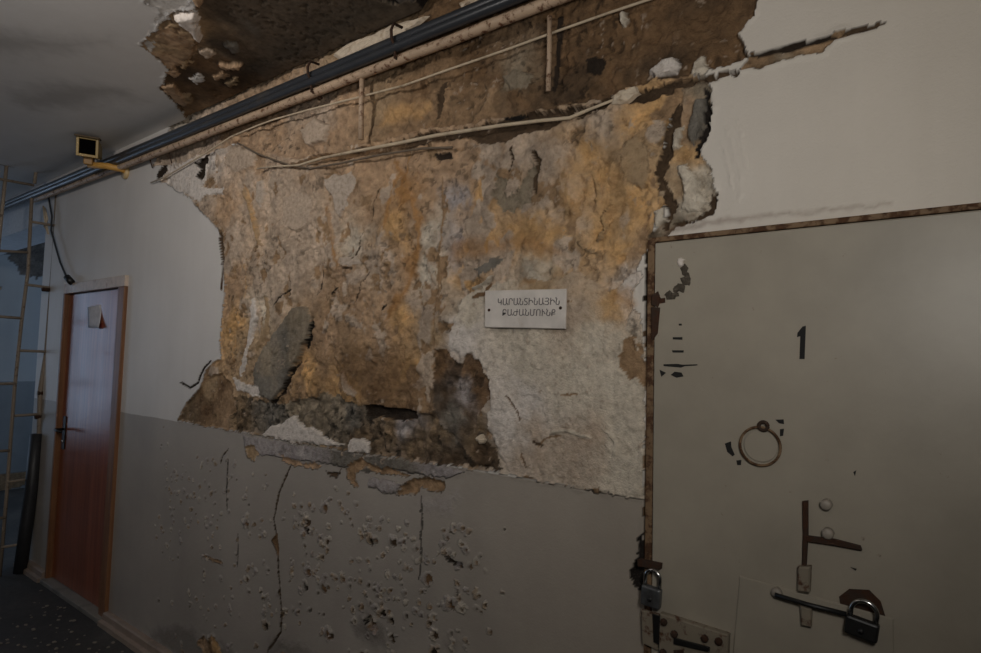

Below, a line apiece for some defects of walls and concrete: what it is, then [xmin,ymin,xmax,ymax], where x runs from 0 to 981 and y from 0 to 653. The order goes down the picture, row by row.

peeling [6,242,45,279]
peeling [142,0,887,515]
crack [272,466,291,634]